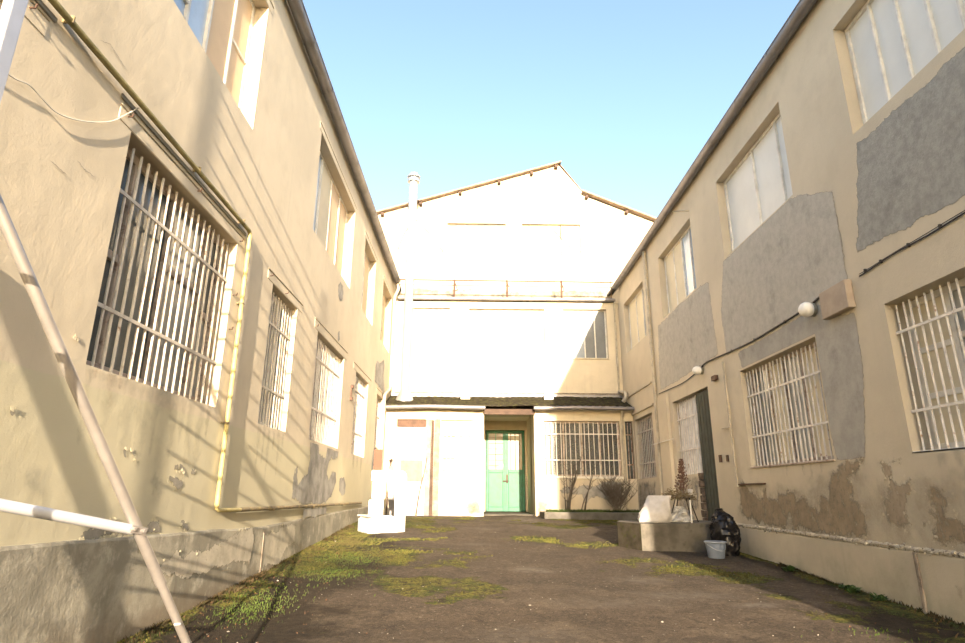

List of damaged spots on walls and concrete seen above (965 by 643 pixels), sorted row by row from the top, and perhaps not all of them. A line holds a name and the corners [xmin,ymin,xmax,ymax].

peeling [78,517,129,540]
peeling [161,442,346,580]
peeling [736,459,965,558]